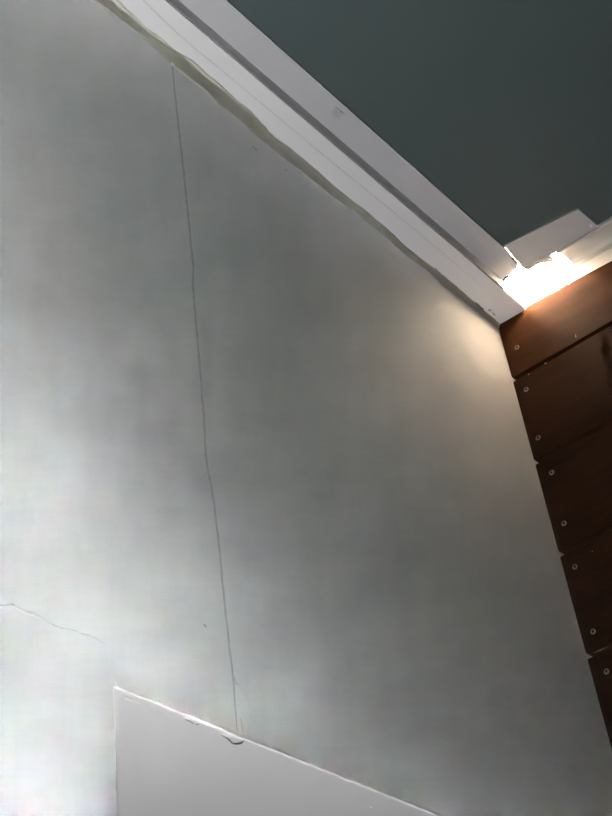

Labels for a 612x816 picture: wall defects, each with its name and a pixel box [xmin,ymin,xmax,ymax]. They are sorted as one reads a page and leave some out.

flaking render [503,254,562,306]
crack [94,0,497,736]
crack [0,603,105,644]